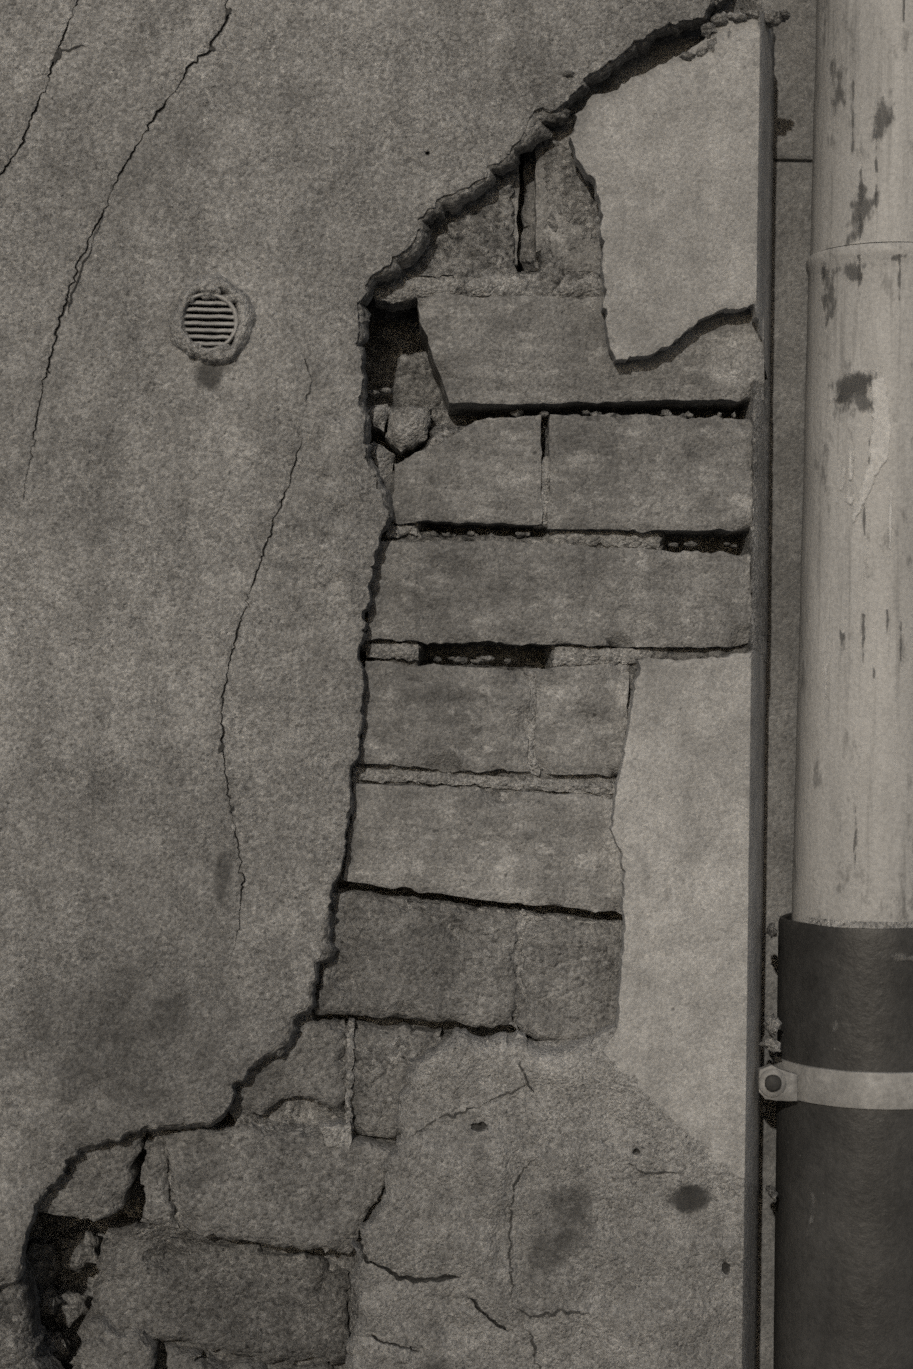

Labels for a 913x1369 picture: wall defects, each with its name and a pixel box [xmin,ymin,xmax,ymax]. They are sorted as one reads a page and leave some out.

crack [0,0,84,176]
crack [29,4,232,466]
crack [218,358,312,964]
flaking render [24,0,790,1245]
flaking render [0,1252,64,1369]
flaking render [345,1023,759,1369]